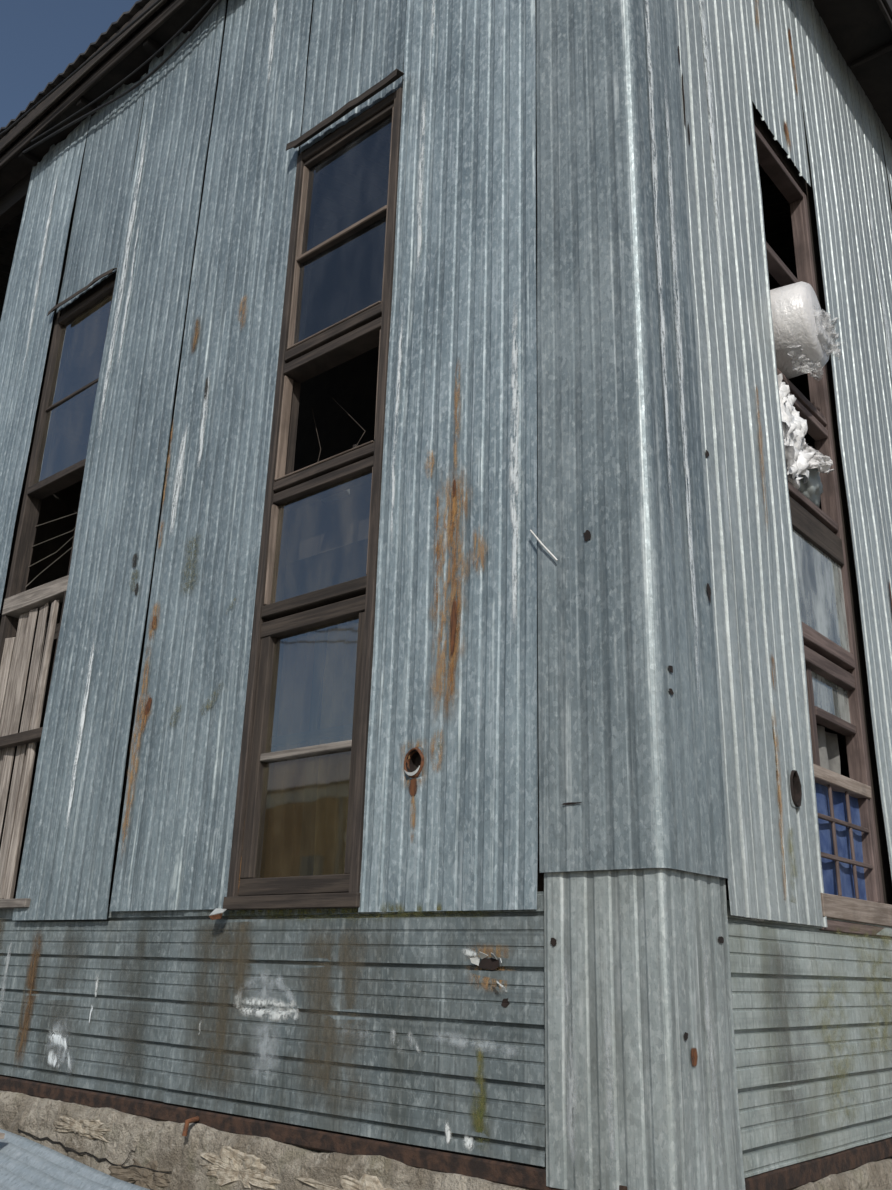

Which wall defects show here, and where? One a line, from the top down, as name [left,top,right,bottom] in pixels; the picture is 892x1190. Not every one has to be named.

rust [434,480,484,702]
rust [140,697,152,731]
rust [407,778,421,826]
rust [15,937,40,1057]